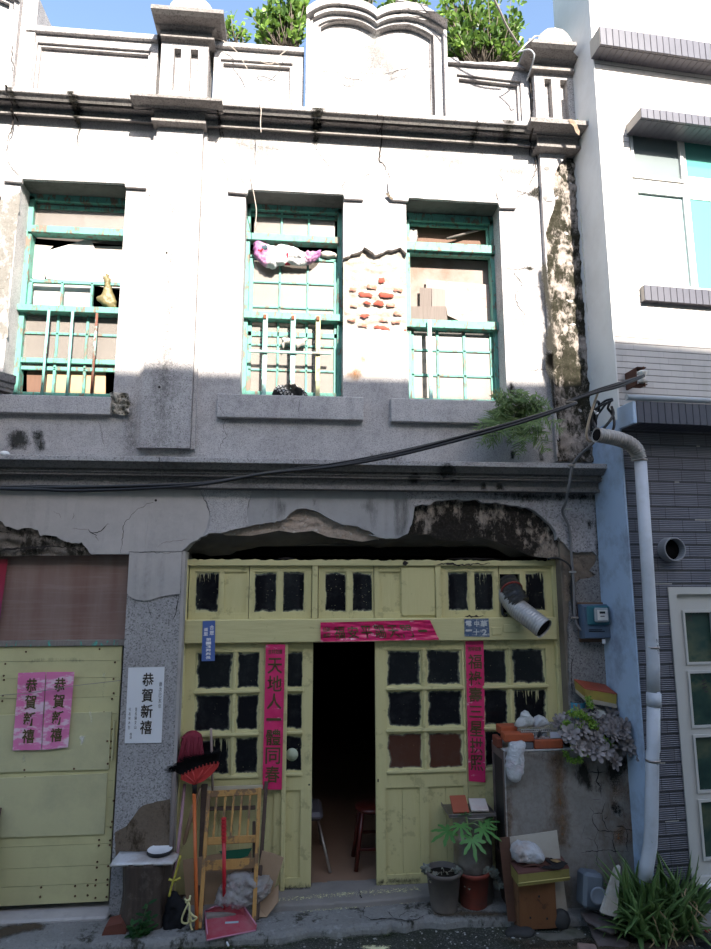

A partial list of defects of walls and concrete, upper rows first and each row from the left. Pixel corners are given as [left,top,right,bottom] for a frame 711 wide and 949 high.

crack [1,41,20,176]
crack [212,110,287,170]
crack [311,111,390,193]
spalling [0,192,20,339]
spalling [343,250,407,332]
water stain [33,430,45,450]
spalling [0,521,91,556]
spalling [223,509,379,542]
spalling [408,500,559,558]
water stain [575,758,628,791]
spalling [115,799,170,867]
crack [582,769,632,864]